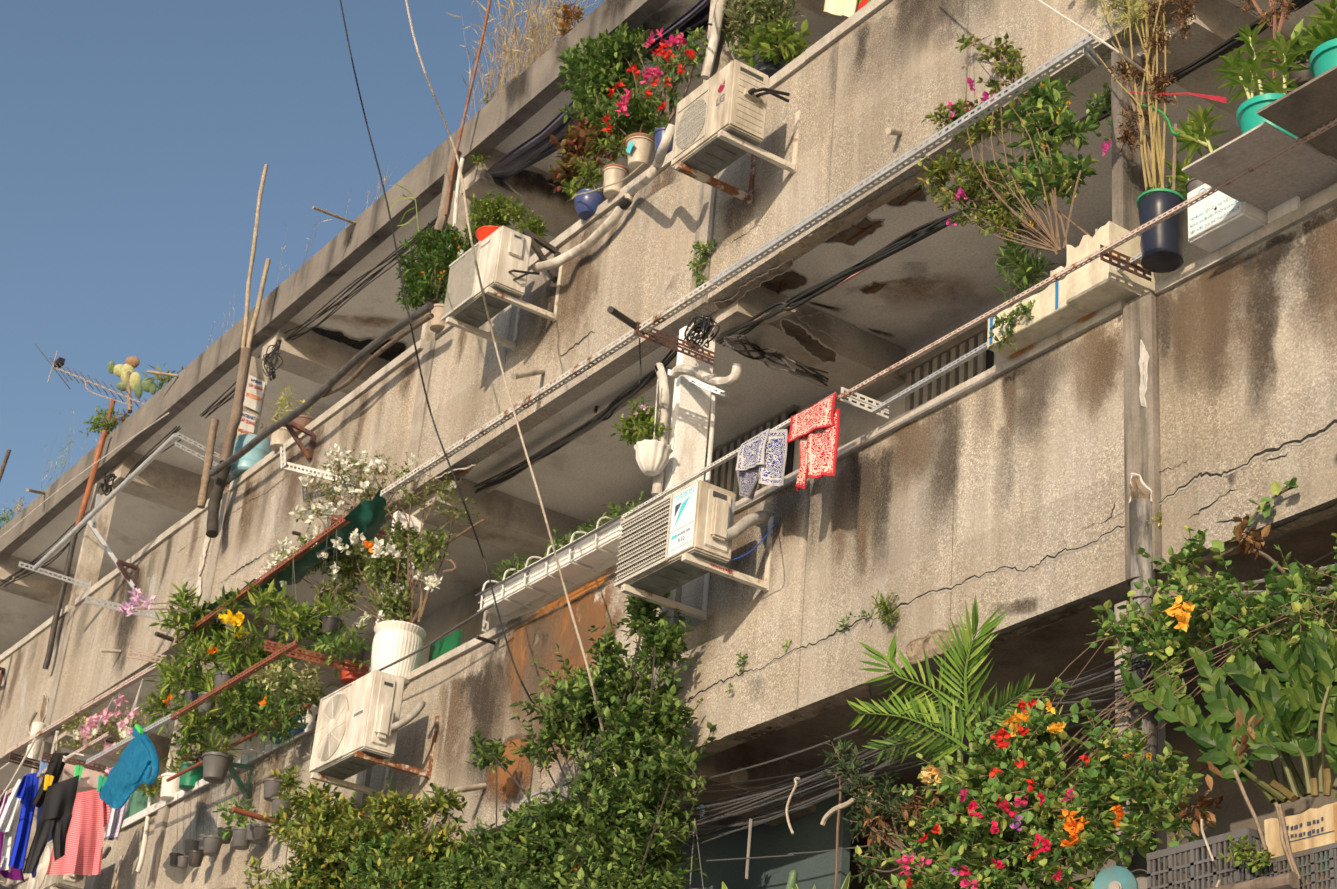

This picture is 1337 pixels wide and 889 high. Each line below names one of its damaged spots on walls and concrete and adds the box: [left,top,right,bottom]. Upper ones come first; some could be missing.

peeling [714,166,929,310]
water stain [1002,359,1049,432]
water stain [1077,326,1122,408]
water stain [1156,208,1337,398]
water stain [730,510,753,569]
water stain [775,485,800,539]
water stain [831,406,960,558]
crack [681,502,1125,706]
crack [1159,419,1337,523]
corrosion [485,573,617,799]